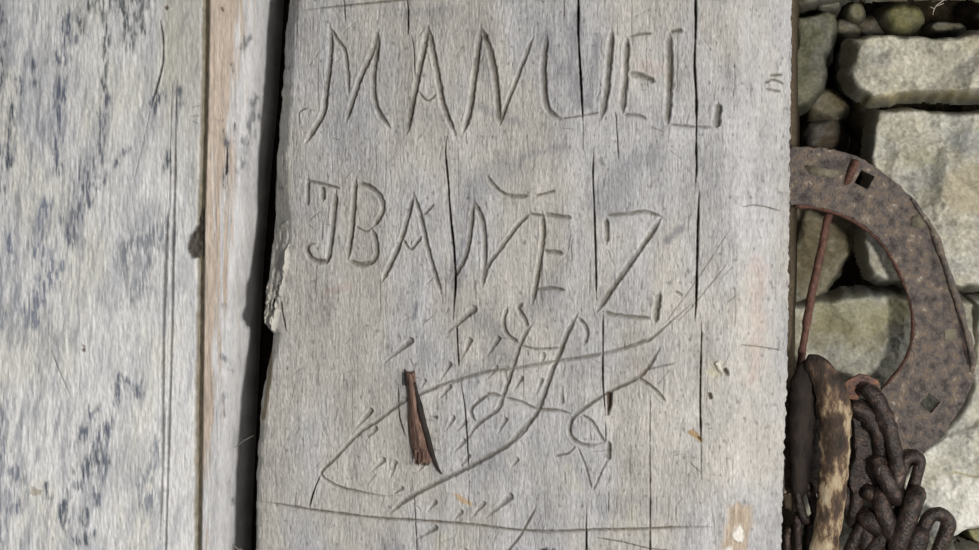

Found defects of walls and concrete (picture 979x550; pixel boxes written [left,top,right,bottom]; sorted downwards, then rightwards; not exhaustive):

crack [692,0,703,482]
peeling [718,500,759,550]